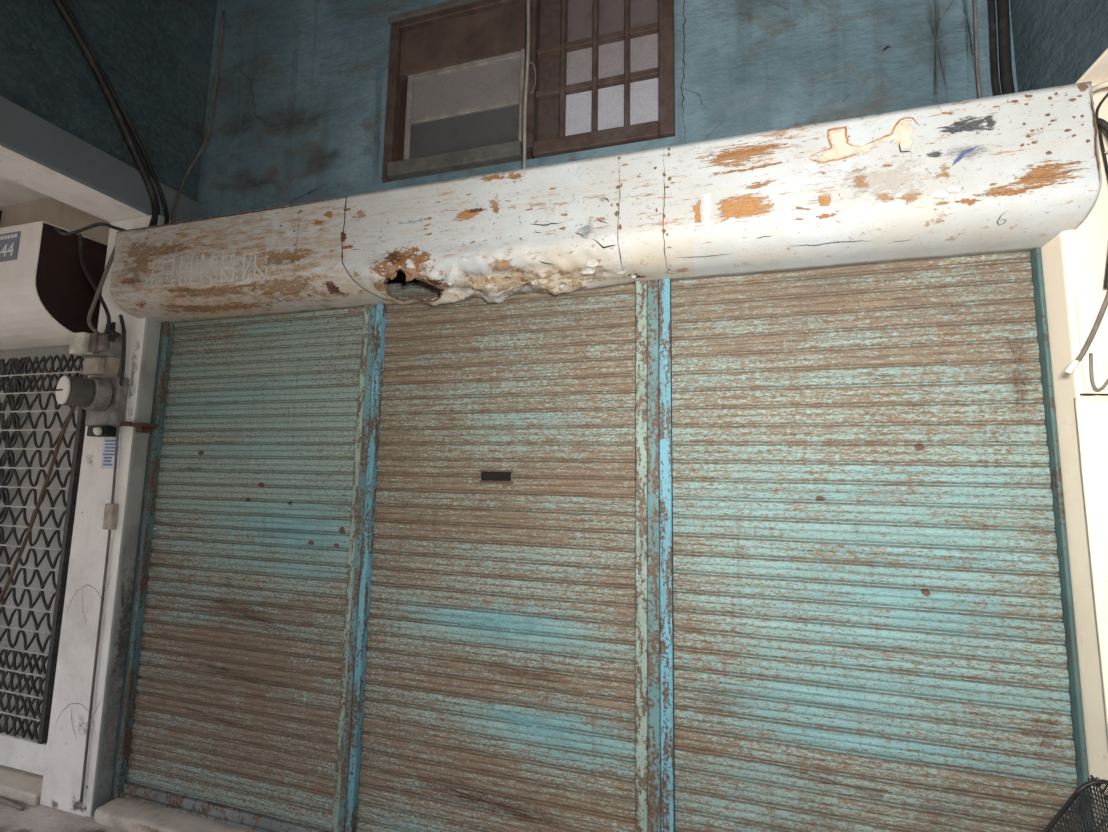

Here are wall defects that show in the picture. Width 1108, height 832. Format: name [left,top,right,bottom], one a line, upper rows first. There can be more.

peeling [883,186,962,213]
peeling [374,265,418,292]